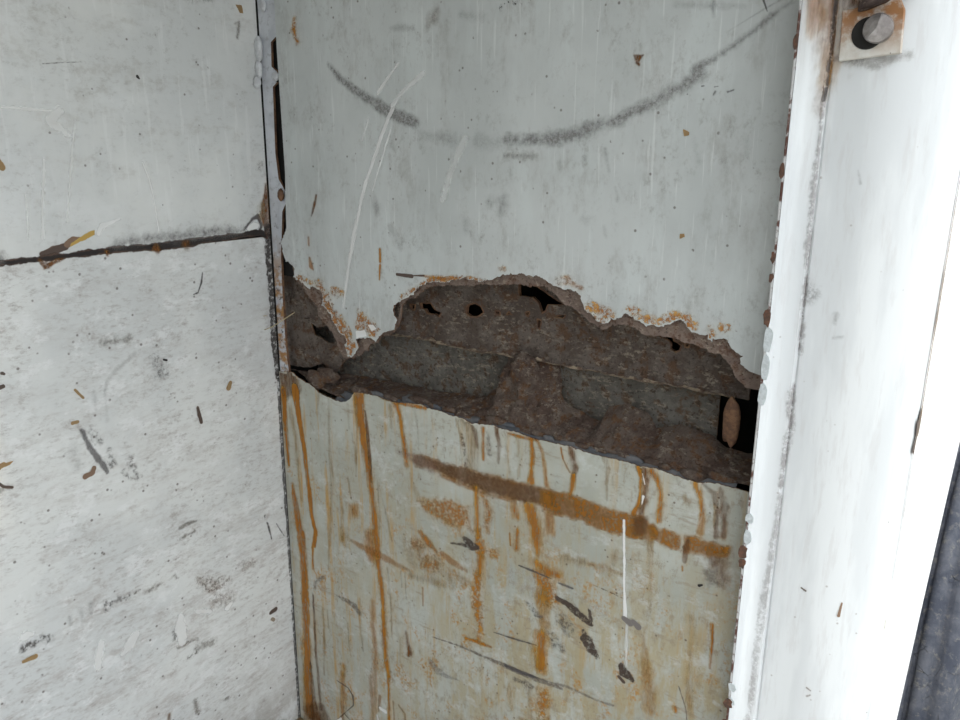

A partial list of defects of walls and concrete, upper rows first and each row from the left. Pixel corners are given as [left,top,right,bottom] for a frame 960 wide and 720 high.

corrosion [763,309,771,327]
peeling [535,357,735,398]
peeling [757,327,773,405]
corrosion [280,367,341,720]
corrosion [341,385,748,720]
peeling [744,513,754,545]